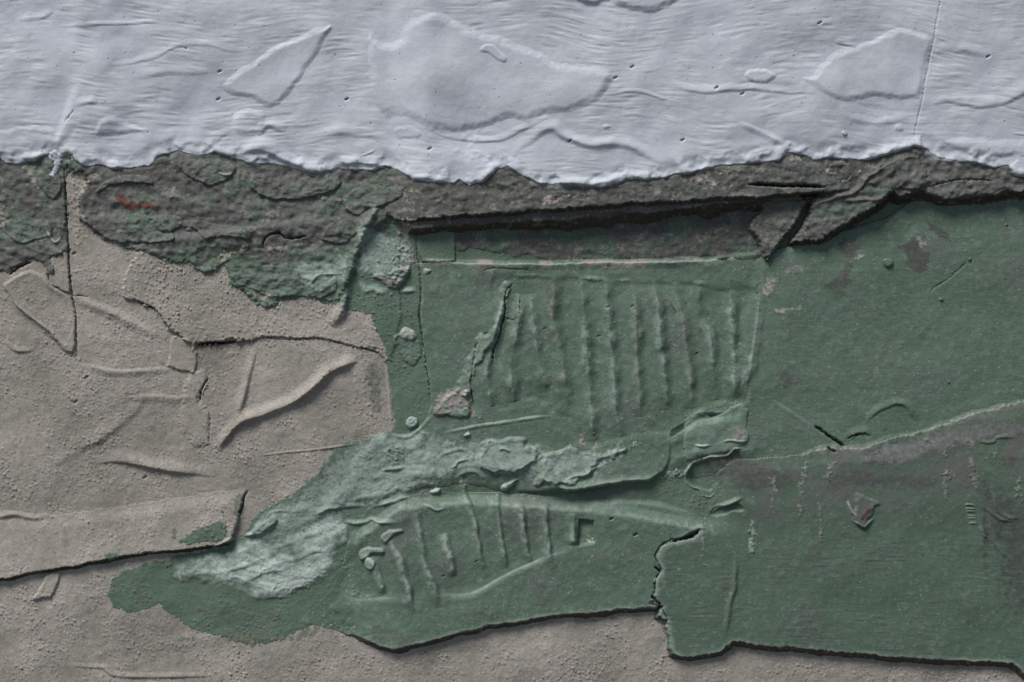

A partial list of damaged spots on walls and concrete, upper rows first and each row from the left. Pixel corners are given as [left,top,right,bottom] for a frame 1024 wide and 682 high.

peeling [0,199,53,244]
peeling [542,190,593,206]
peeling [747,149,934,263]
crack [10,181,82,342]
peeling [21,154,389,449]
peeling [357,265,417,296]
crack [197,339,236,347]
peeling [32,570,61,601]